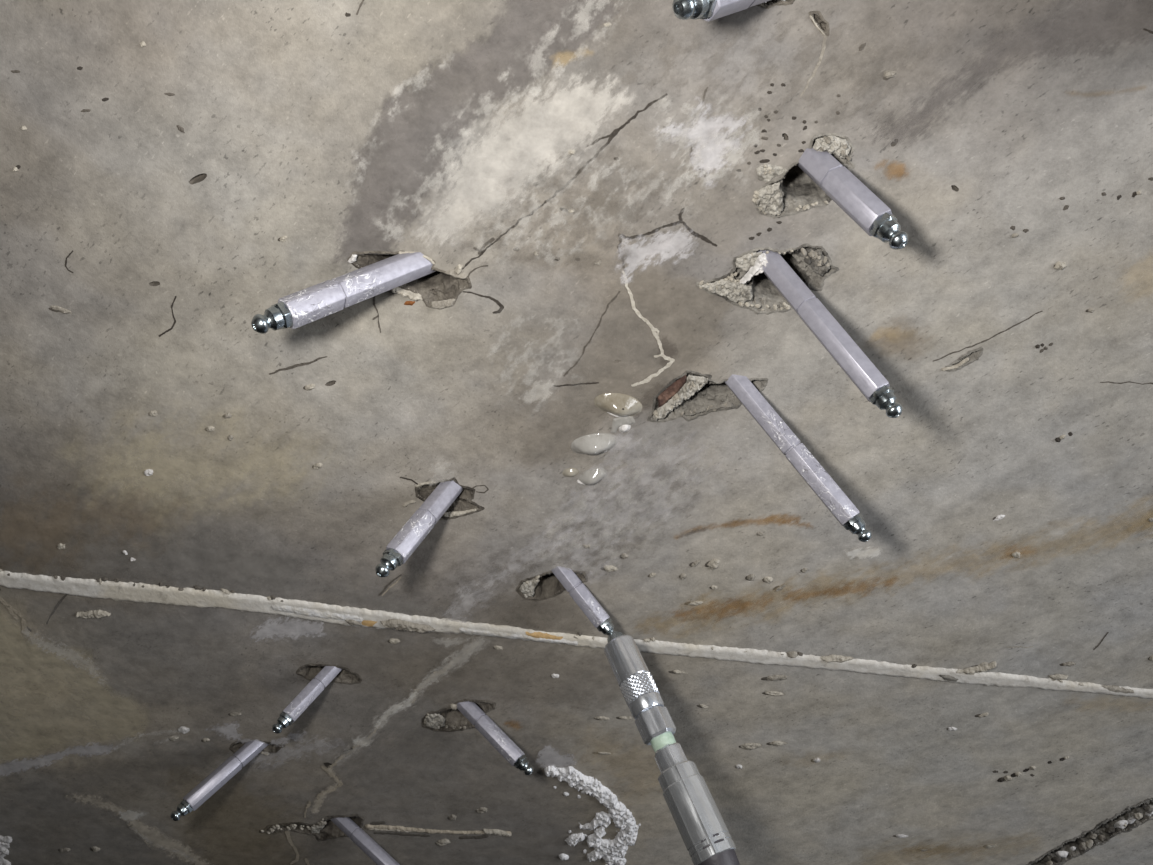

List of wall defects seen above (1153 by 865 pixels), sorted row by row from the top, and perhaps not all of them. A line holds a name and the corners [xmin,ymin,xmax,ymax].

leakage [344,0,615,256]
leakage [662,102,746,185]
spalling [809,133,855,169]
crack [462,87,736,314]
spalling [752,160,832,219]
crack [552,208,717,387]
leakage [616,229,693,283]
spalling [696,243,839,315]
spalling [647,370,742,422]
spalling [749,378,768,392]
spalling [402,477,485,520]
spalling [516,571,566,601]